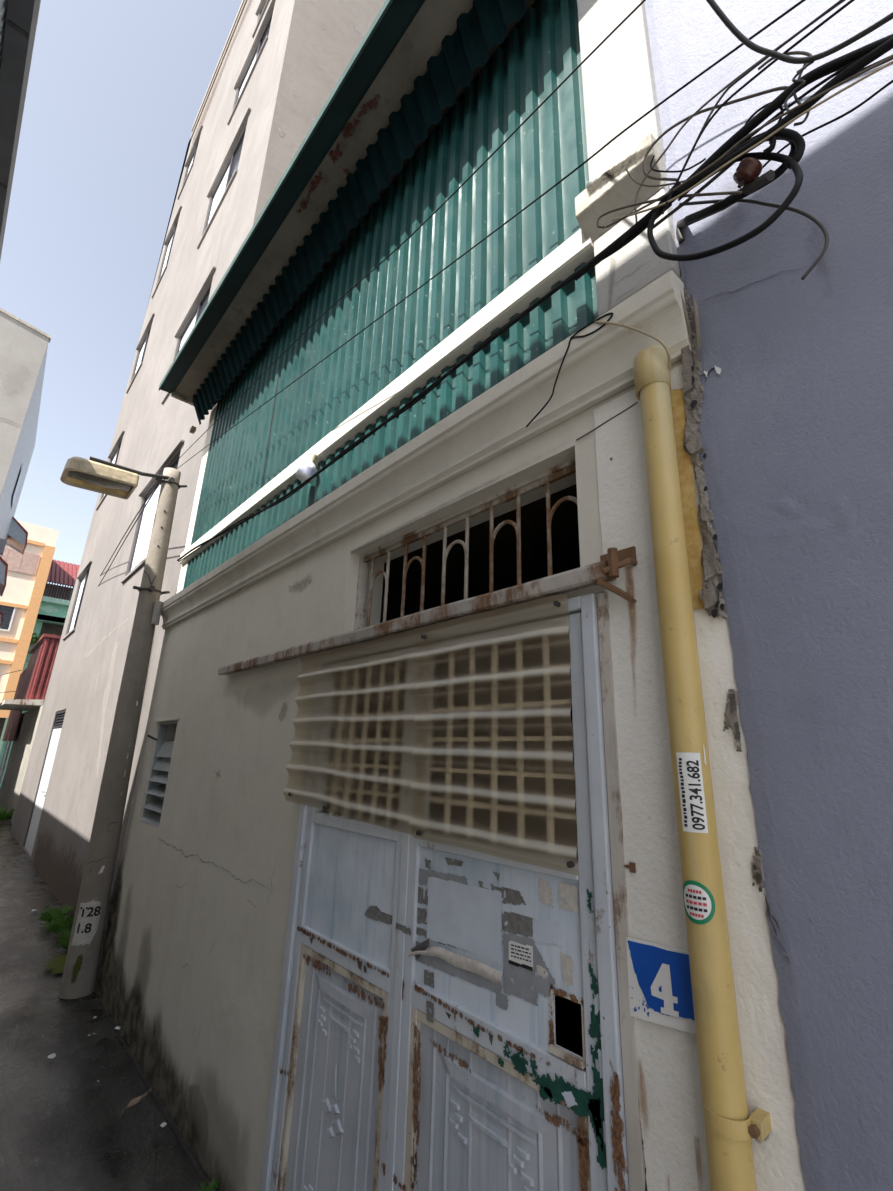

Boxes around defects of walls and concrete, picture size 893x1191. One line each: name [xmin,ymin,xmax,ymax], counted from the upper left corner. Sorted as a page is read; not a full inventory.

flaking render [680,288,727,619]
water stain [33,837,81,917]
rust [297,926,389,978]
water stain [95,864,229,1191]
rust [345,980,388,1092]
rust [378,1023,471,1191]
rust [402,982,551,1067]
peeling [473,964,607,1170]
rust [536,1105,591,1191]
rust [548,986,583,1046]
rust [610,1061,628,1191]